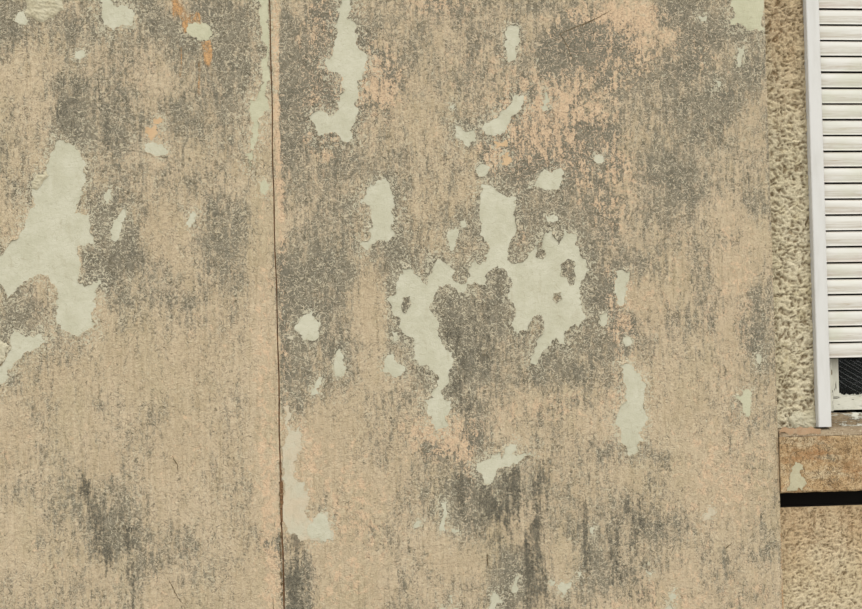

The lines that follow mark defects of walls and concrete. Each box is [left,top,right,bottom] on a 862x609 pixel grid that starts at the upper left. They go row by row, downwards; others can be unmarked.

peeling [727,0,765,35]
peeling [305,0,372,146]
peeling [0,136,129,341]
peeling [356,174,400,254]
peeling [380,92,633,434]
peeling [0,326,49,388]
peeling [612,360,652,460]
water stain [81,481,112,573]
peeling [282,405,334,542]
water stain [479,470,520,544]
peeling [472,441,534,488]
water stain [525,517,547,608]